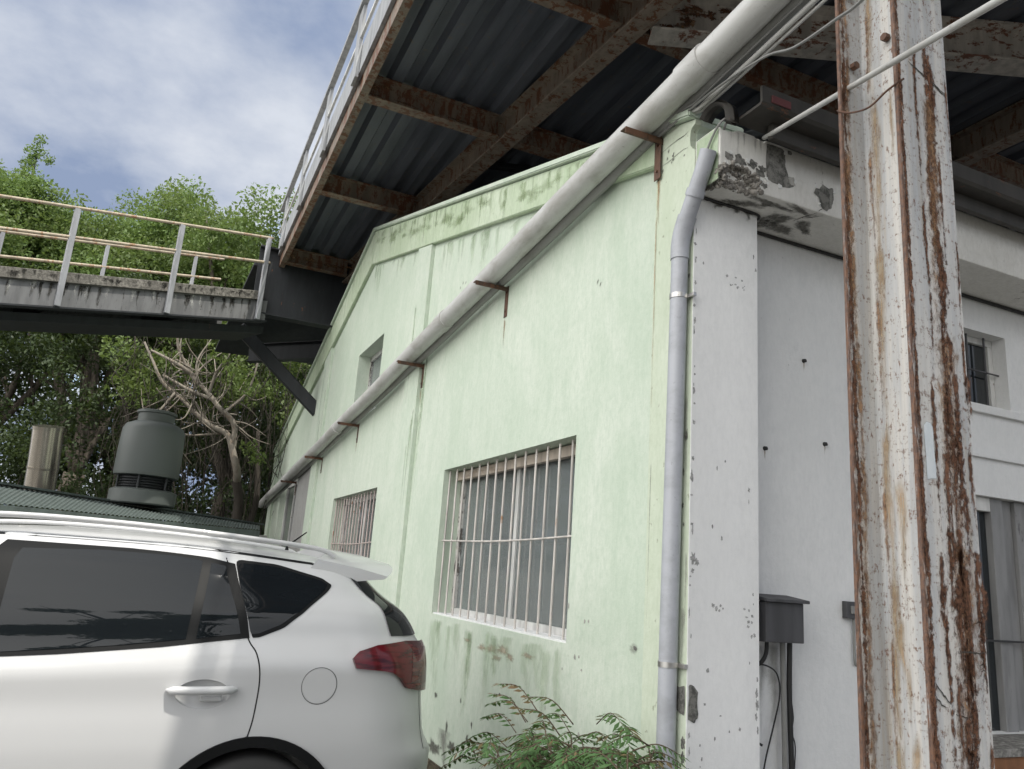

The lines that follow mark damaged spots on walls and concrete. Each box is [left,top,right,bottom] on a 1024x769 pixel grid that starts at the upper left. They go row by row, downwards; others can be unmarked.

spalling [705,144,797,196]
peeling [814,184,836,211]
corrosion [869,0,994,769]
leakage [428,722,472,753]
peeling [677,685,706,764]